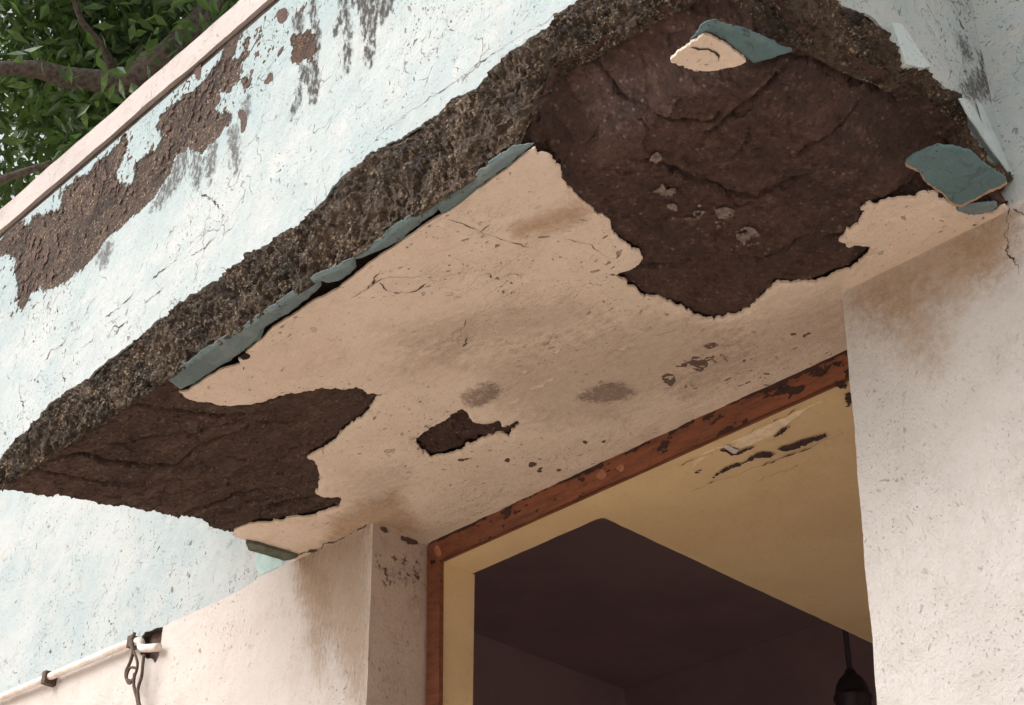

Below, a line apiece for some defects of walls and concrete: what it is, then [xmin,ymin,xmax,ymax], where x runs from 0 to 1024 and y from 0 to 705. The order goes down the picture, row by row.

spalling [0,0,1014,532]
leakage [580,383,633,403]
peeling [431,462,610,546]